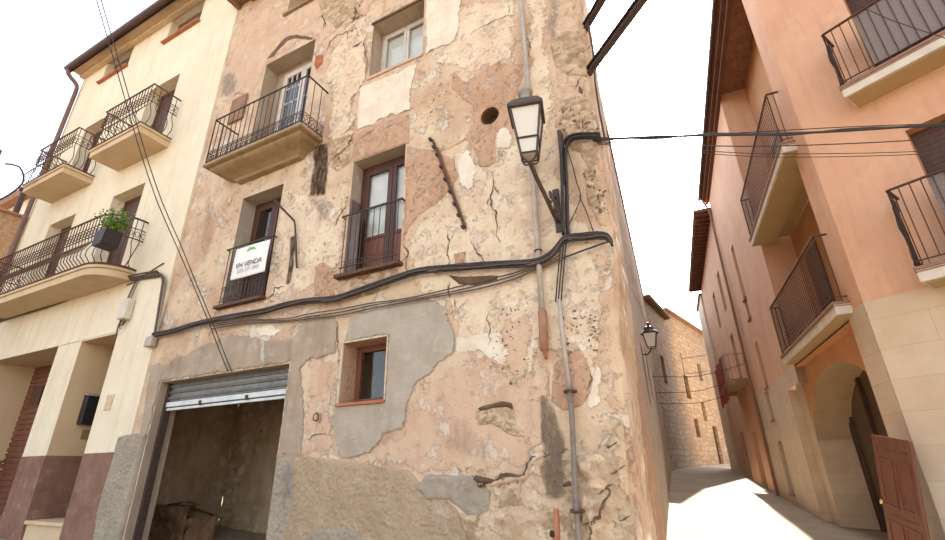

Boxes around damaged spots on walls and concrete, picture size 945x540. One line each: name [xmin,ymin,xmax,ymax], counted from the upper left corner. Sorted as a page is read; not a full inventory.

spalling [550,31,588,76]
flaking render [327,63,523,240]
crack [447,171,501,307]
flaking render [475,311,596,447]
spalling [459,420,637,540]